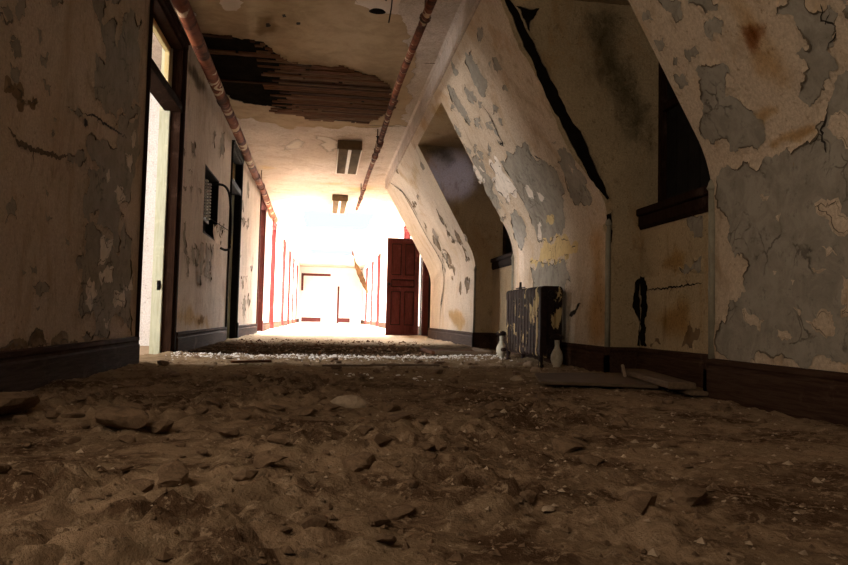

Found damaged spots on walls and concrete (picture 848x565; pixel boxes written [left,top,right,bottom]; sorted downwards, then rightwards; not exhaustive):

peeling [4,75,38,112]
spalling [189,0,418,130]
peeling [446,0,615,293]
peeling [654,0,848,369]
peeling [424,209,470,295]
peeling [0,328,78,351]
spalling [630,275,649,348]